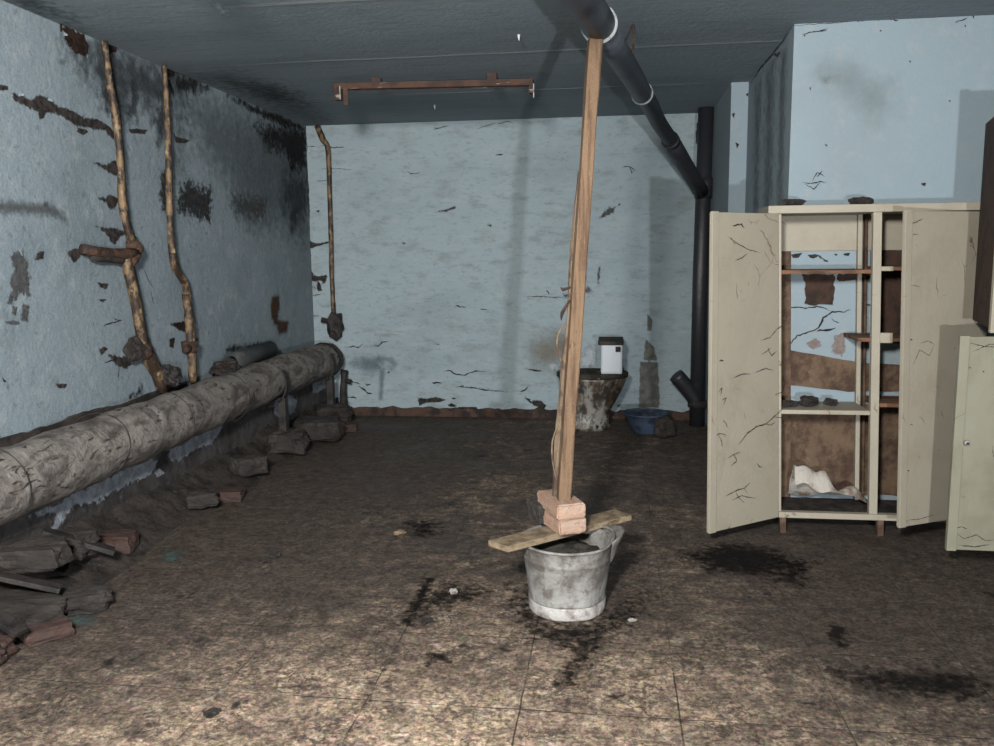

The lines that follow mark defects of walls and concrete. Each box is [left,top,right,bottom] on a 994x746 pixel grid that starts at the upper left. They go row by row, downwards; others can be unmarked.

spalling [60,24,89,58]
spalling [0,85,114,139]
water stain [227,96,308,231]
peeling [5,248,44,325]
water stain [580,347,597,368]
water stain [679,542,807,586]
water stain [402,578,488,626]
water stain [508,584,642,686]
water stain [828,625,847,647]
water stain [831,665,994,701]